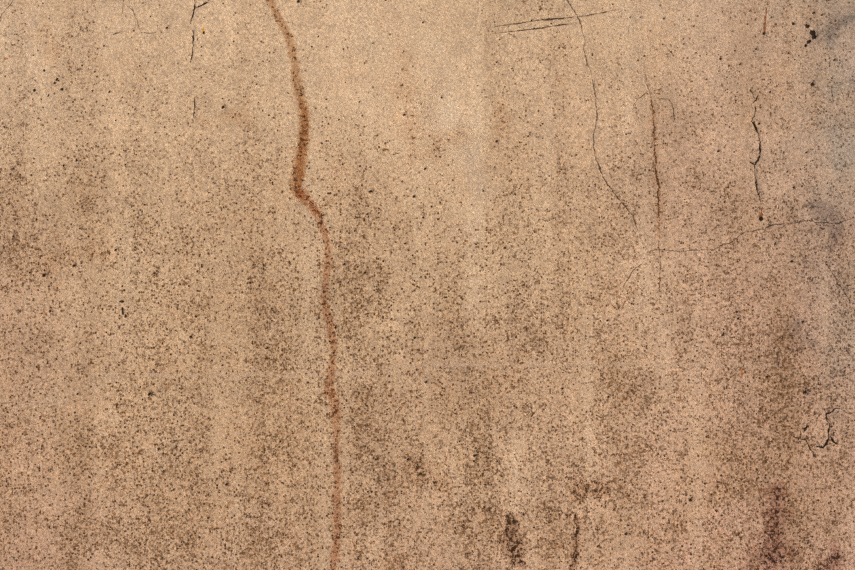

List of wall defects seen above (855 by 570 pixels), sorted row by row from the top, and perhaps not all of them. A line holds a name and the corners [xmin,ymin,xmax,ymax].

crack [190,0,208,63]
rust [271,6,332,233]
crack [567,0,855,291]
rust [321,242,338,414]
water stain [500,512,526,570]
water stain [750,482,800,570]